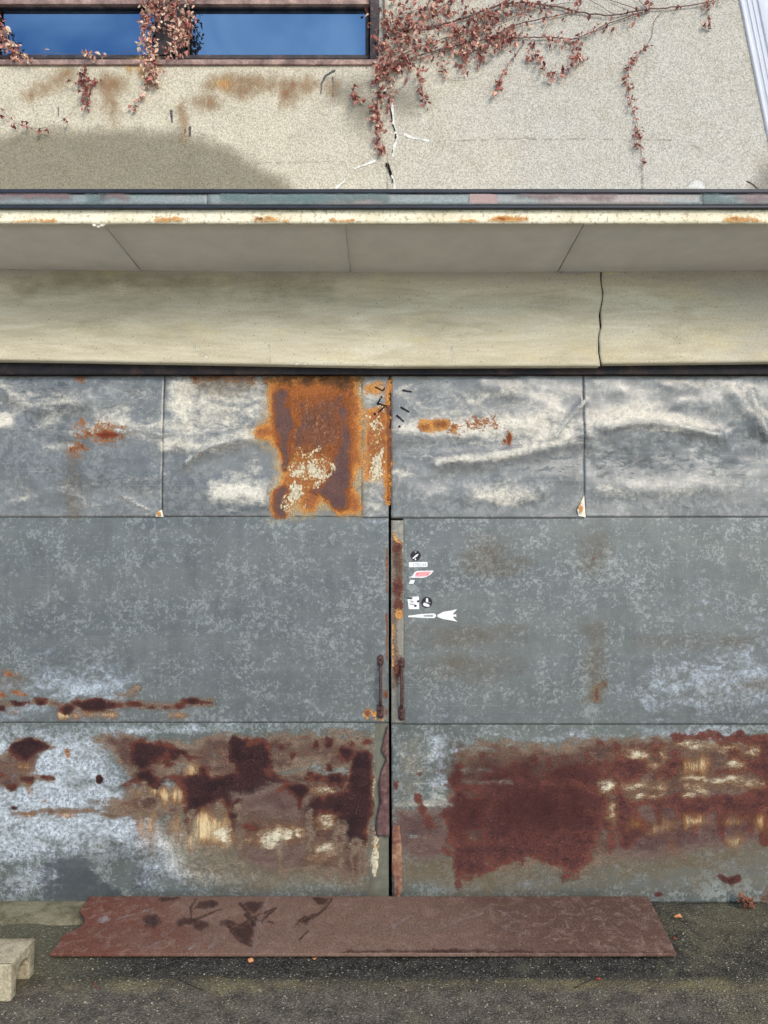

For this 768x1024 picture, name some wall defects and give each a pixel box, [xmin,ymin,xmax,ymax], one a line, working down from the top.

crack [335,89,433,189]
crack [595,272,603,367]
corrosion [65,417,133,459]
corrosion [190,376,393,519]
corrosion [417,414,513,445]
corrosion [362,533,404,721]
corrosion [0,684,214,719]
corrosion [0,737,72,791]
corrosion [11,728,375,883]
corrosion [393,729,768,890]